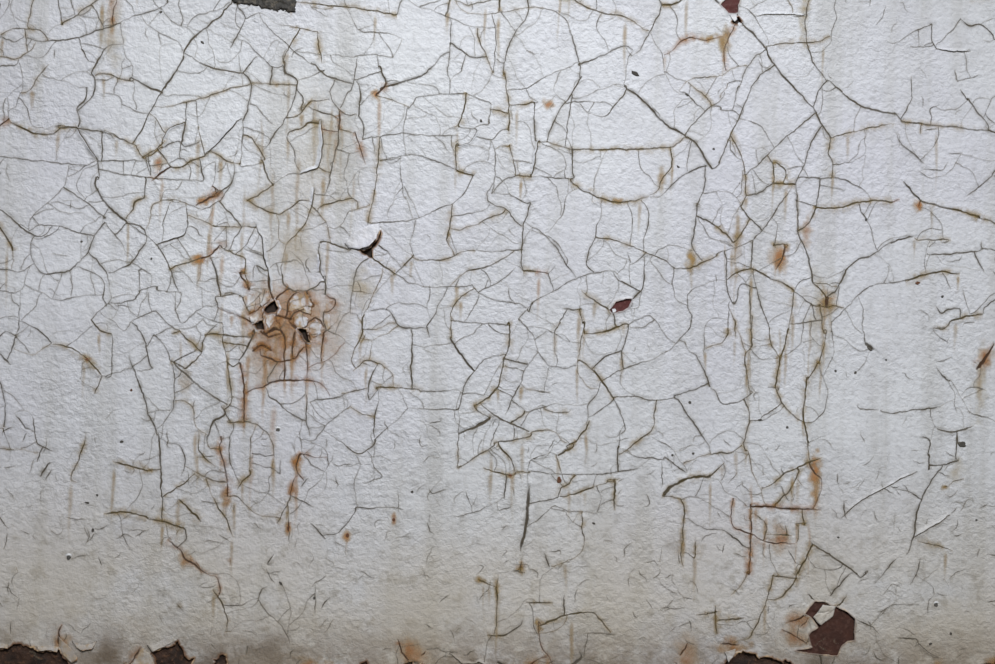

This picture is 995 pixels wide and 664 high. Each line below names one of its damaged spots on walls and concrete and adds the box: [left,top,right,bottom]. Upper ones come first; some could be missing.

crack [439,0,518,74]
peeling [717,0,744,22]
peeling [345,223,380,249]
crack [315,250,476,400]
peeling [607,297,635,317]
crack [634,455,725,562]
rust [810,458,819,499]
crack [858,343,994,578]
crack [699,543,868,643]
peeling [0,638,77,664]
peeling [132,636,199,664]
peeling [719,599,858,664]